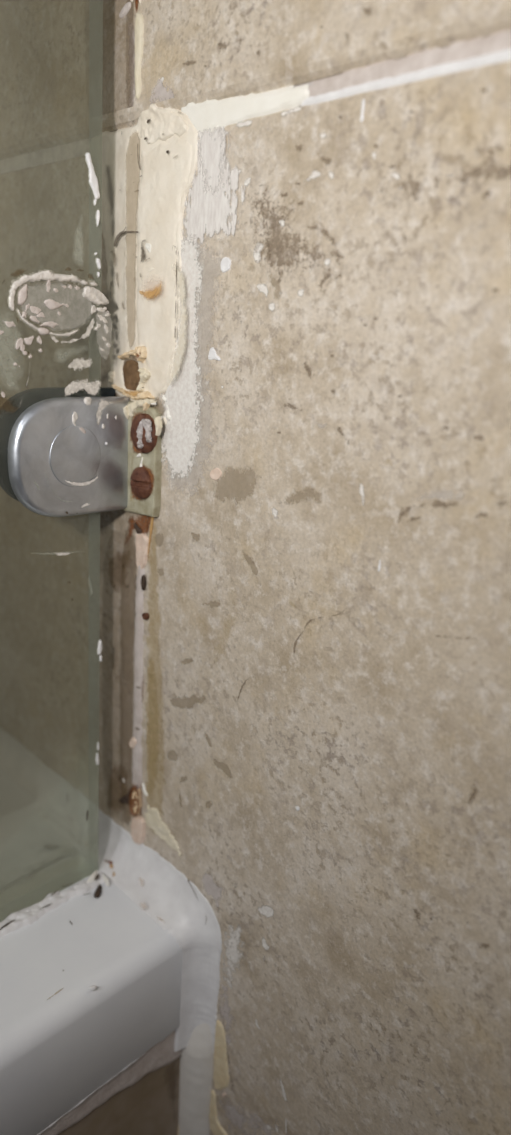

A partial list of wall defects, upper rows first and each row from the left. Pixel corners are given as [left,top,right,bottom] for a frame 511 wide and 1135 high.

corrosion [130,414,157,453]
corrosion [132,515,154,552]
corrosion [119,785,142,816]